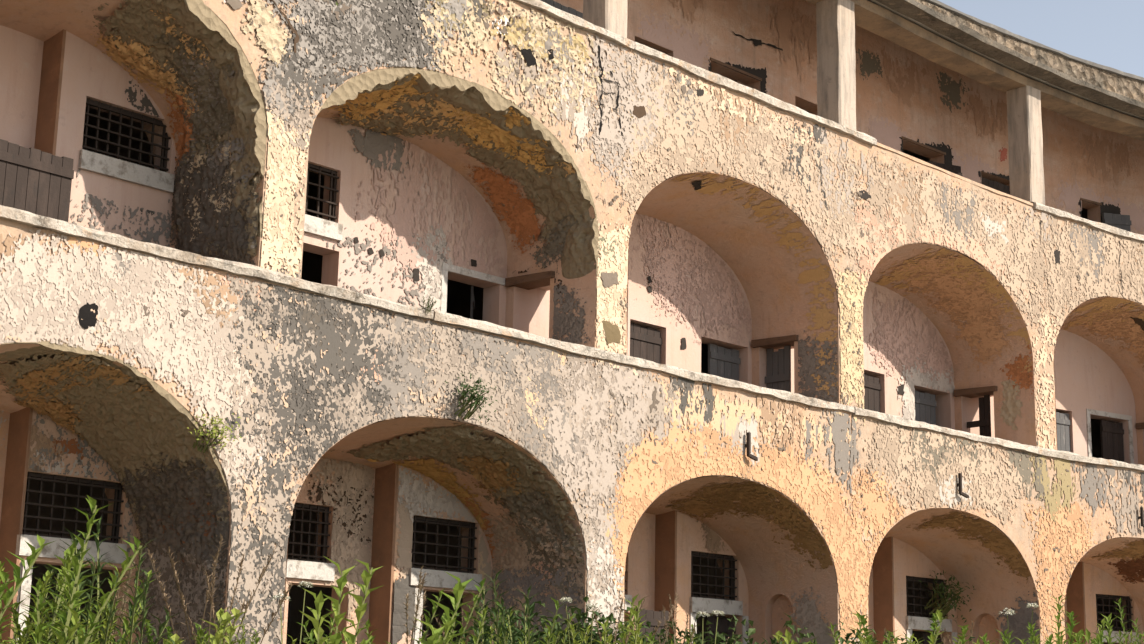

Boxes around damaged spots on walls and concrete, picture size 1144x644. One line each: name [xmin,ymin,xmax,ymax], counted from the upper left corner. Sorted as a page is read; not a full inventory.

leakage [71,40,258,286]
spalling [82,0,310,282]
leakage [251,0,495,138]
leakage [323,139,507,309]
spalling [296,0,877,454]
crack [598,45,623,136]
leakage [493,0,1144,408]
leakage [28,278,1144,644]